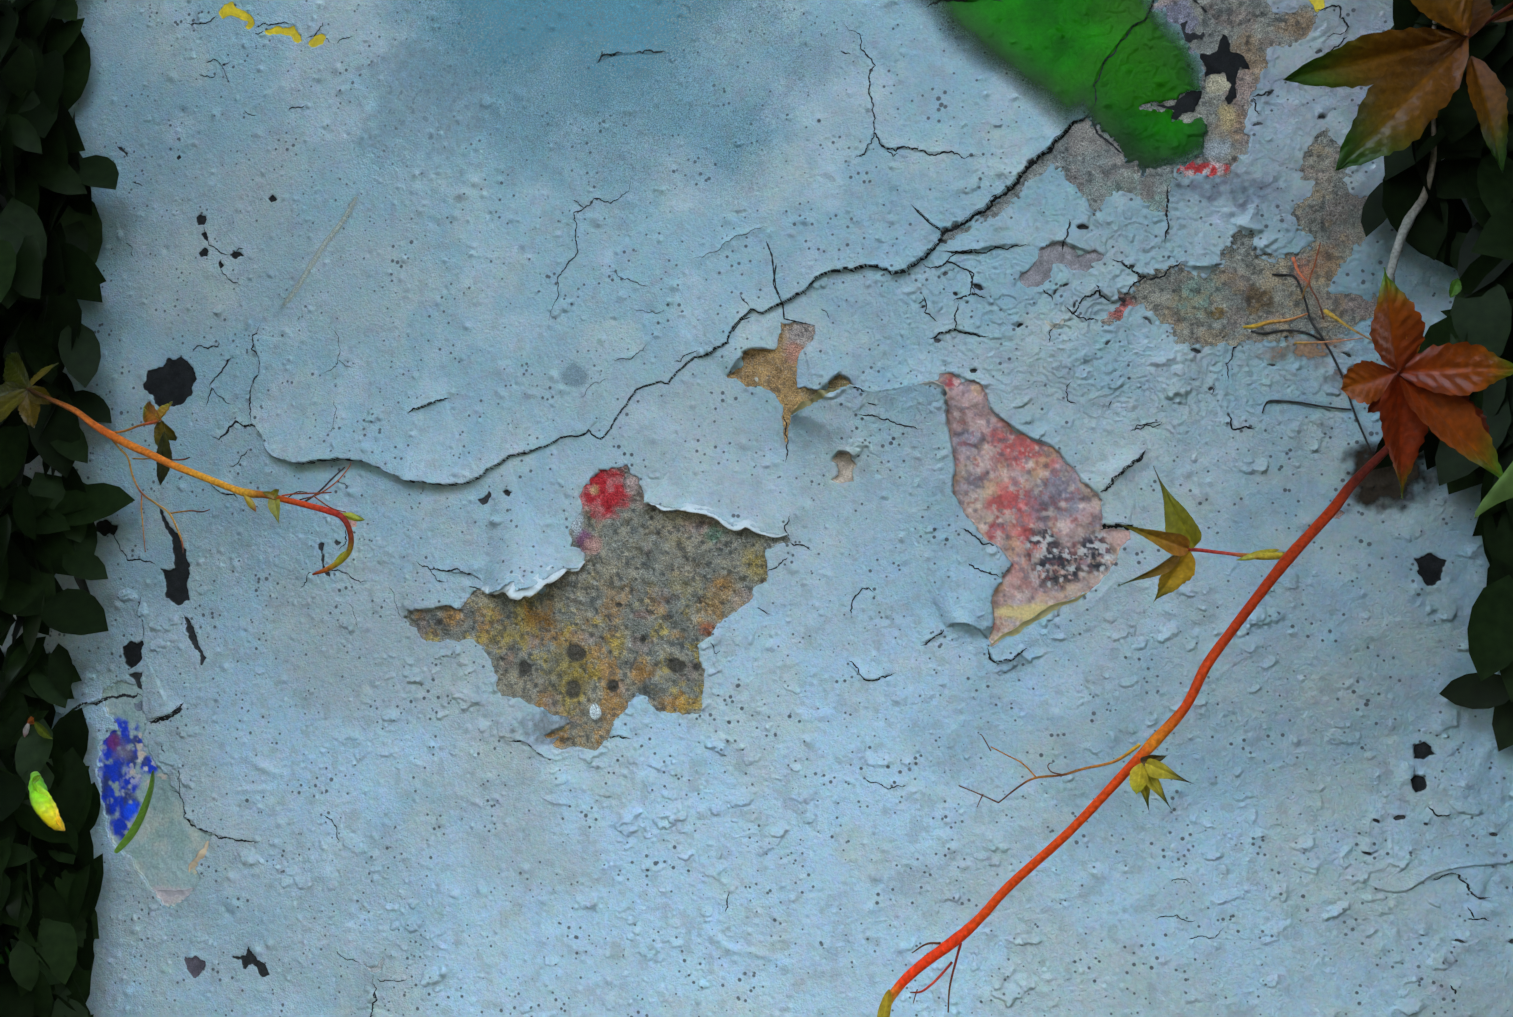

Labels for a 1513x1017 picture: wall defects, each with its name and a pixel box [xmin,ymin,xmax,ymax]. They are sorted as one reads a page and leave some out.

peeling [405,465,790,750]
crack [188,0,1154,497]
peeling [727,322,851,442]
peeling [920,369,1130,647]
peeling [1020,241,1104,295]
crack [1043,184,1180,342]
crack [1065,382,1162,530]
peeling [940,0,1322,244]
peeling [1101,115,1378,370]